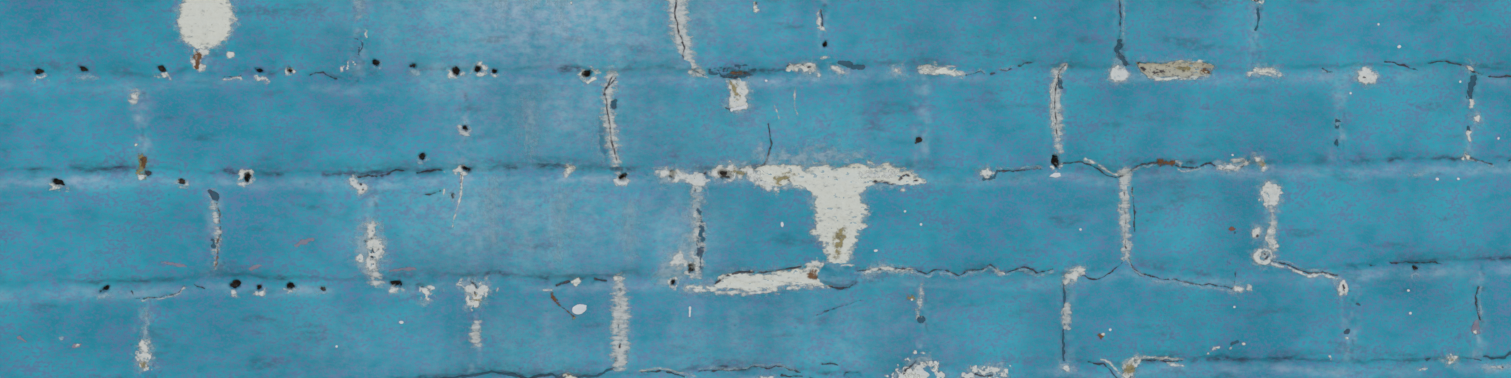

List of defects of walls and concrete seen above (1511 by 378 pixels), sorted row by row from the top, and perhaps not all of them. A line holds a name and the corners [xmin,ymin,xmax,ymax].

peeling [177,0,237,72]
spalling [1108,39,1214,83]
crack [857,62,1236,289]
peeling [654,150,926,296]
peeling [355,221,489,347]
spalling [865,264,925,323]
peeling [885,350,1011,378]